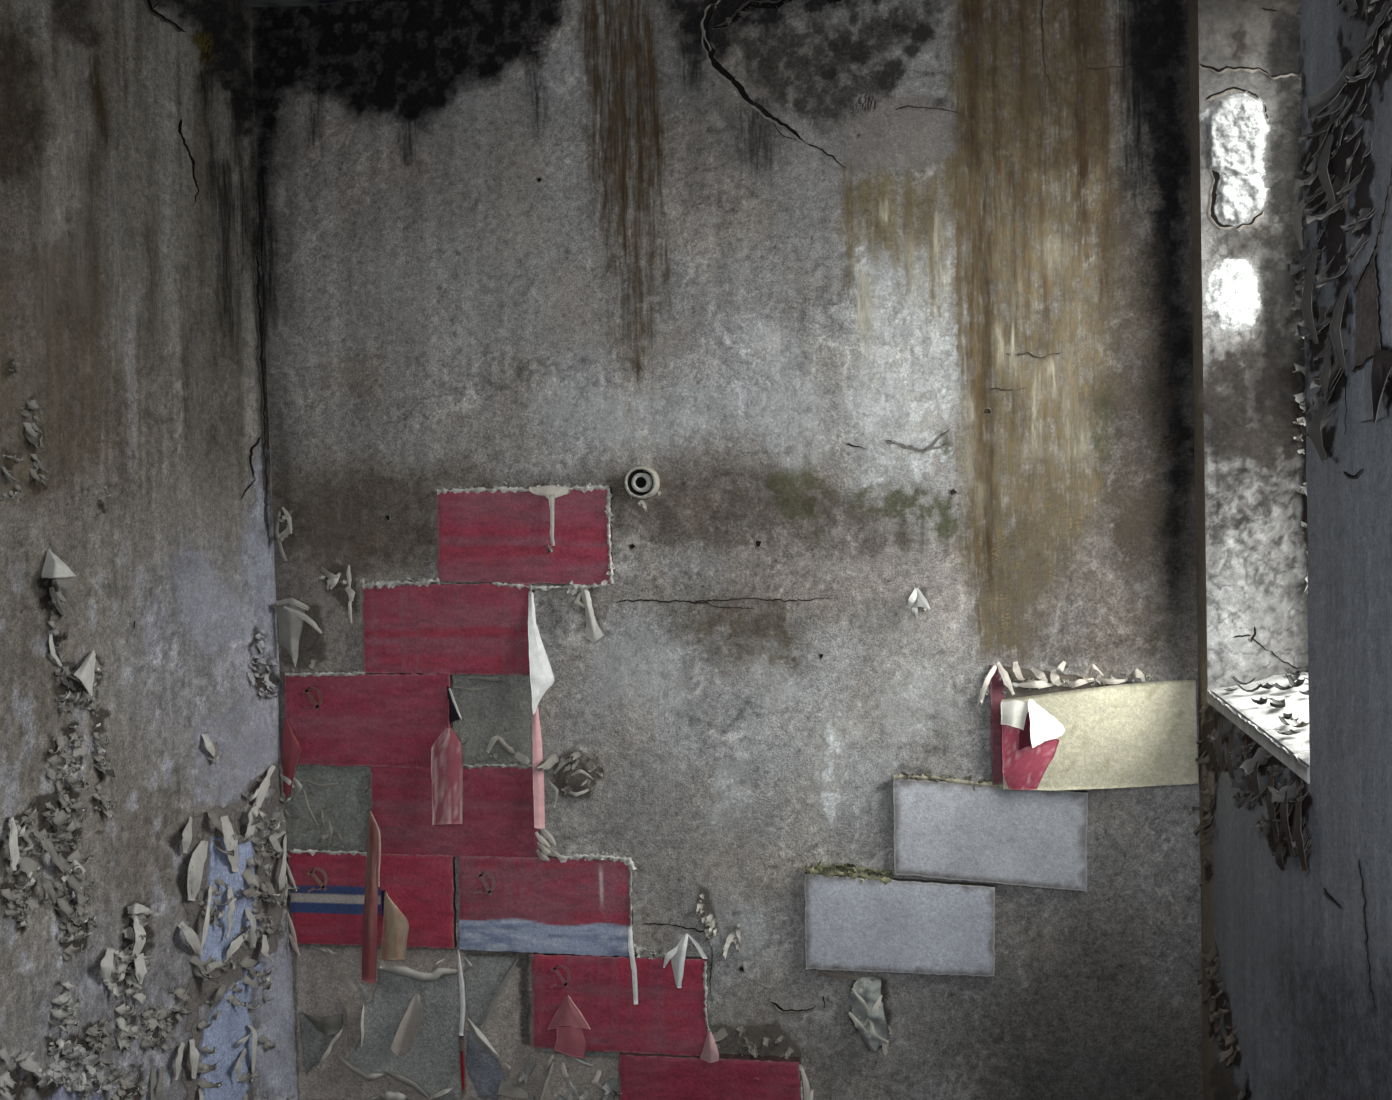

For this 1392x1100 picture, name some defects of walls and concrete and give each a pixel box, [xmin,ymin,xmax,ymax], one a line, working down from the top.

crack [700,0,847,169]
water stain [669,0,940,168]
crack [895,105,961,114]
flaking render [1201,92,1271,226]
water stain [153,0,563,500]
rust [952,0,1119,658]
peeling [1286,0,1392,594]
water stain [608,471,913,550]
crack [610,598,836,609]
peeling [0,548,118,963]
peeling [0,762,622,1100]
crack [1323,859,1375,1008]